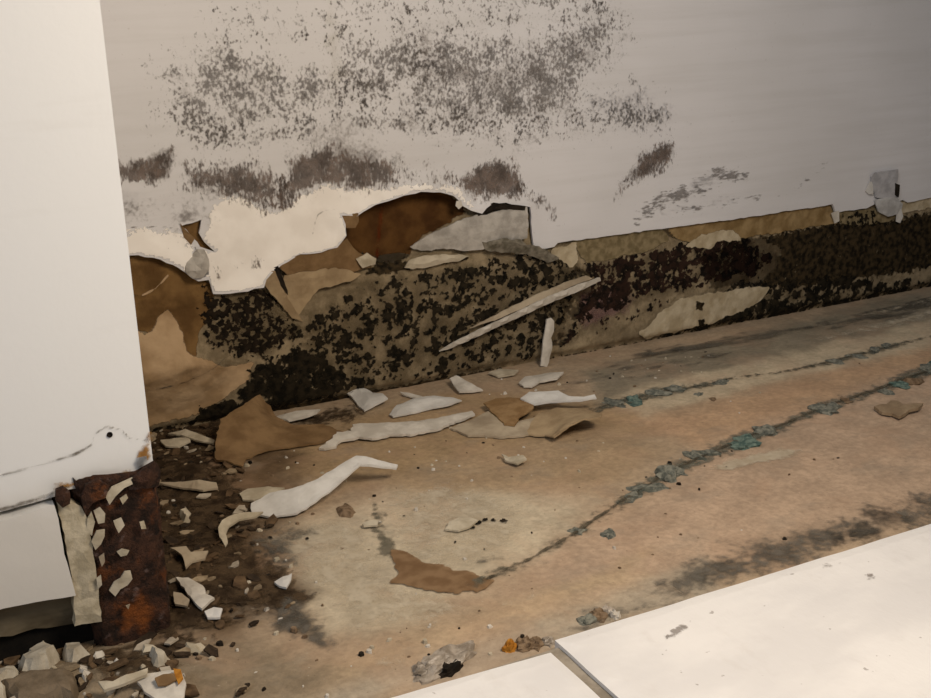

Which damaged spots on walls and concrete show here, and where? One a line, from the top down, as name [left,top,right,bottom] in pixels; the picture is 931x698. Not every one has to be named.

damp [171,0,621,148]
damp [119,146,173,186]
damp [183,142,414,215]
damp [431,157,557,219]
peeling [865,169,931,223]
flaking render [126,181,483,427]
peeling [439,275,601,352]
peeling [519,372,597,406]
crack [593,338,923,412]
rust [137,435,150,460]
damp [79,211,931,678]
crack [486,361,931,579]